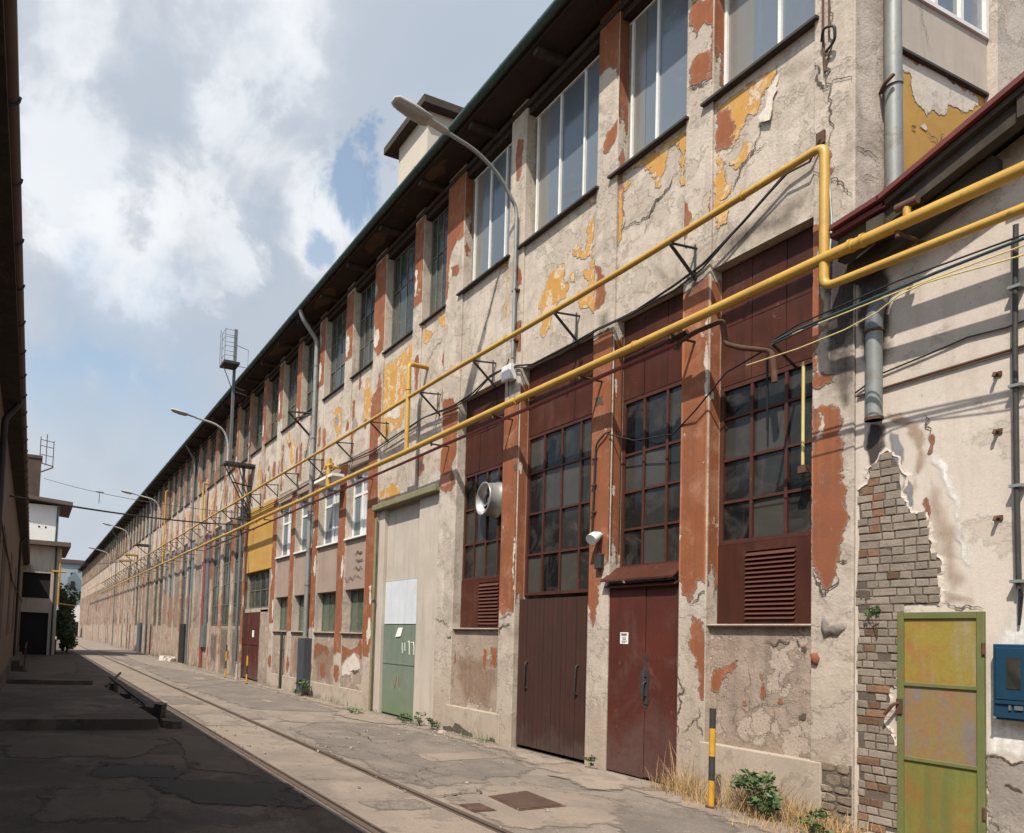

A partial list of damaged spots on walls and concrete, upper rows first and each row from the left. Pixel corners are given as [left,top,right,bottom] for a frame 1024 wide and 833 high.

peeling [538,195,606,337]
peeling [599,0,686,245]
crack [621,173,677,231]
peeling [684,203,692,249]
peeling [687,0,725,89]
peeling [708,68,779,232]
peeling [902,54,979,143]
peeling [161,171,474,682]
peeling [679,274,737,700]
damp [866,415,970,565]
spalling [801,646,820,666]
spalling [811,404,948,833]